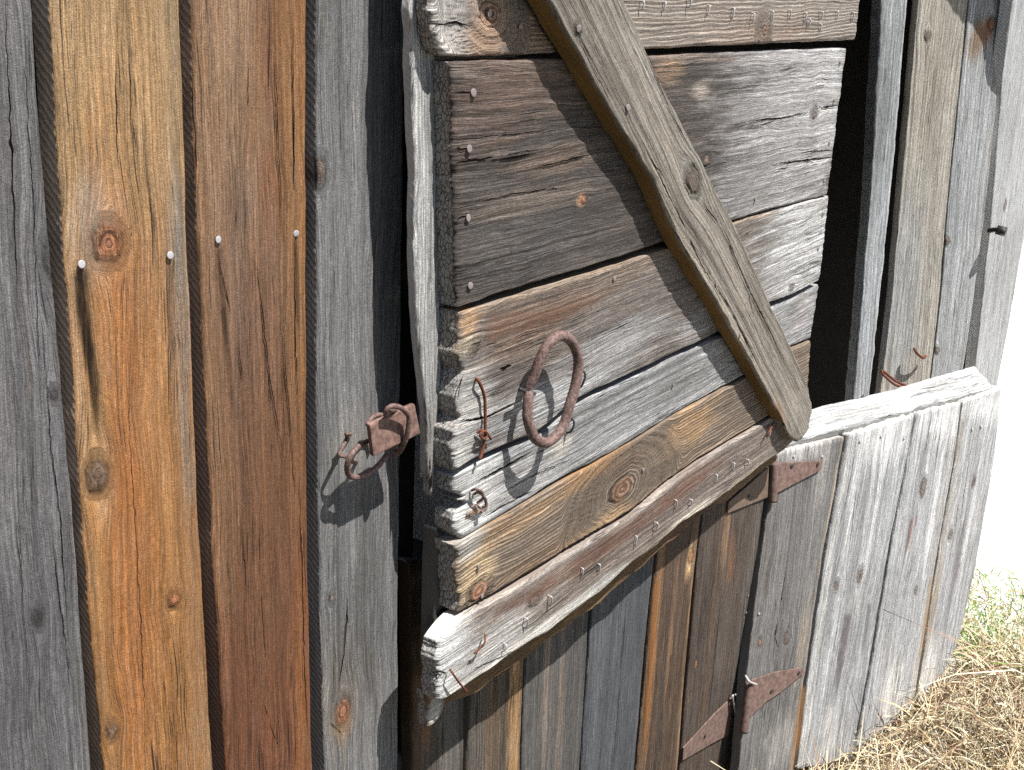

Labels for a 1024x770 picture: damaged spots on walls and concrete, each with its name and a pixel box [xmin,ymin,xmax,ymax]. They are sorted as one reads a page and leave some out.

crack [742,105,838,128]
crack [456,129,590,220]